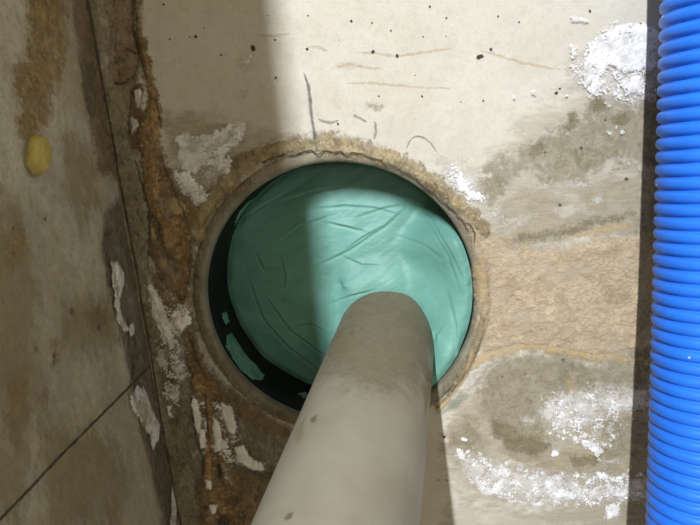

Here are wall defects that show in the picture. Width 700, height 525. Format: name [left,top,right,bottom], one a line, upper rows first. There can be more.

corrosion [129,0,291,525]
crack [262,72,476,244]
leakage [173,18,661,525]